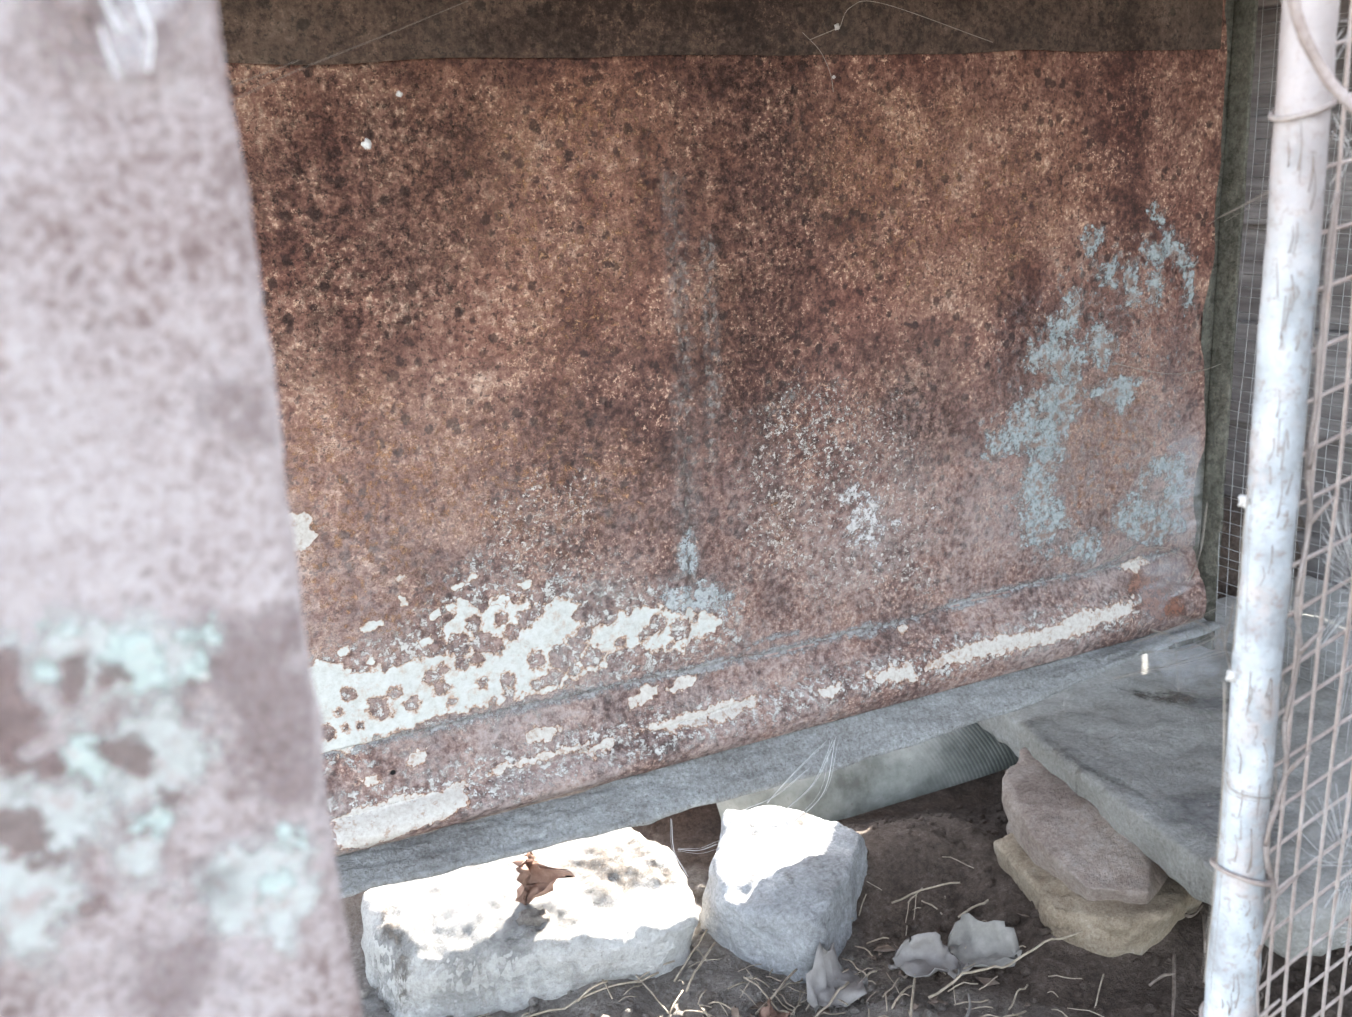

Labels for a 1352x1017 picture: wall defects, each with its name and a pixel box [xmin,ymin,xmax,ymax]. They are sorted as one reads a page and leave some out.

peeling [974,201,1198,575]
peeling [291,511,319,552]
rust [285,392,629,582]
peeling [796,397,901,567]
rust [1126,571,1185,623]
peeling [310,530,1147,856]
peeling [193,822,321,950]